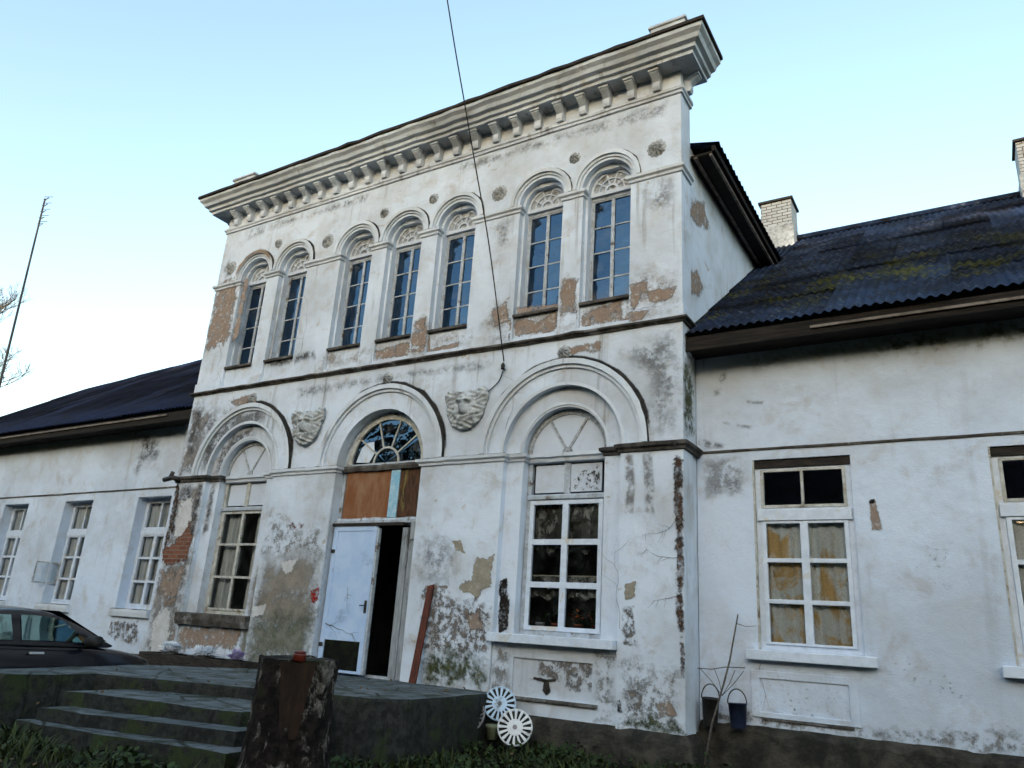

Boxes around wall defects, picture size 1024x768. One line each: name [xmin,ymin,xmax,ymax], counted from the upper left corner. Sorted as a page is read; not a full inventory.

peeling [690,200,709,229]
peeling [206,278,249,351]
peeling [376,317,459,359]
peeling [488,278,676,339]
water stain [522,345,665,423]
peeling [869,499,882,530]
peeling [108,484,241,653]
water stain [240,524,320,662]
peeling [421,540,510,658]
water stain [494,648,507,690]
water stain [538,656,614,703]
water stain [627,668,675,717]